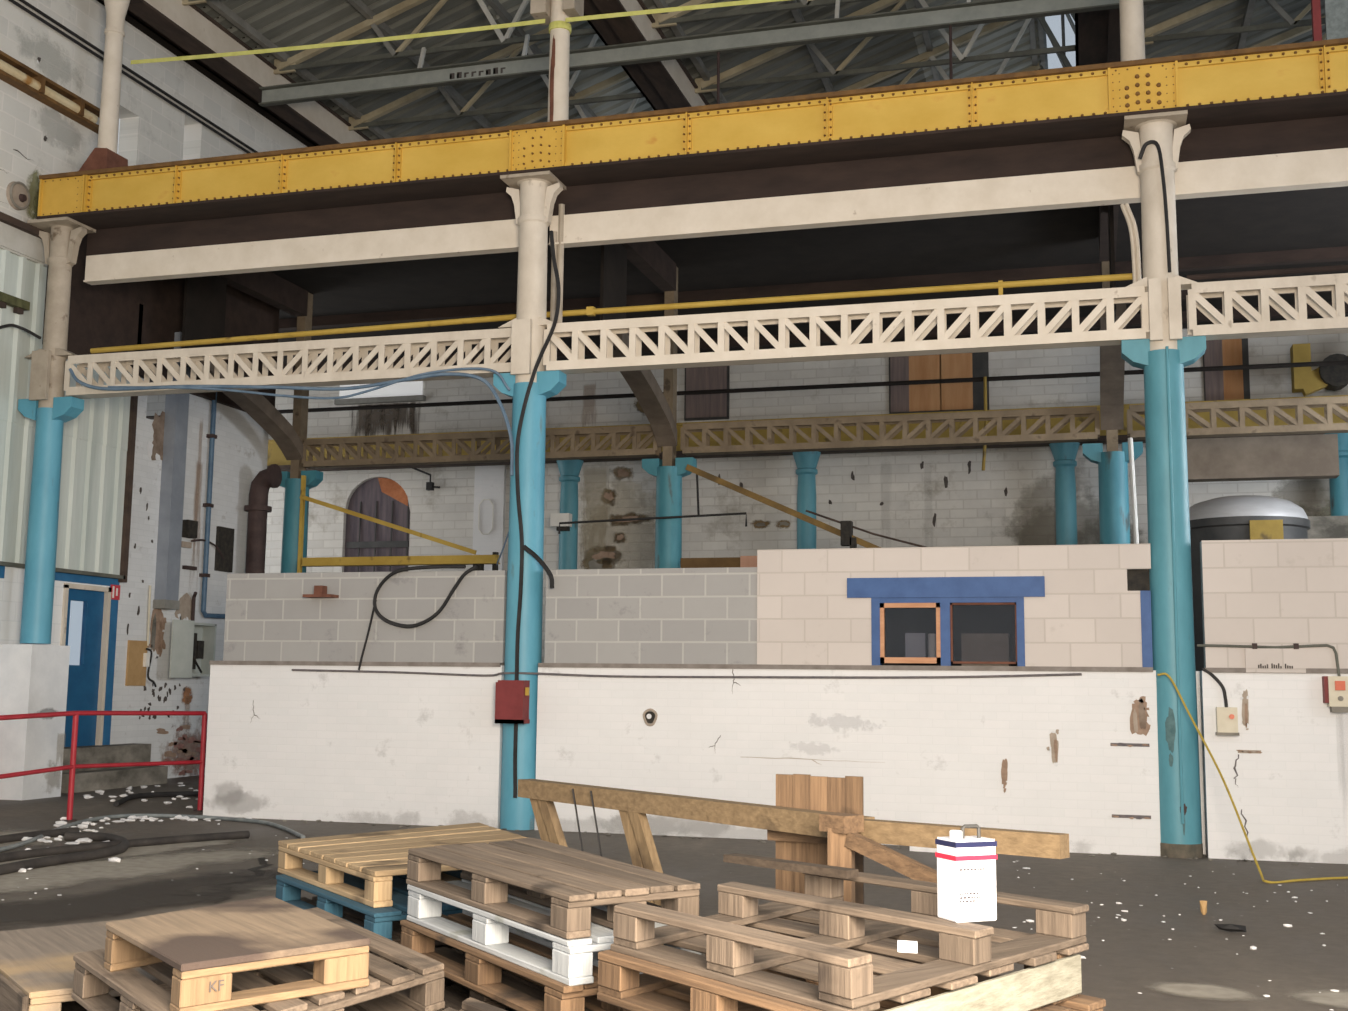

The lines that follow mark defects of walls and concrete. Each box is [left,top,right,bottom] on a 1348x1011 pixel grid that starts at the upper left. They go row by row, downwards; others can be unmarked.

peeling [147,411,165,461]
flaking render [581,467,649,569]
spalling [139,682,207,776]
peeling [1047,729,1059,767]
peeling [1111,696,1176,767]
peeling [1240,689,1249,730]